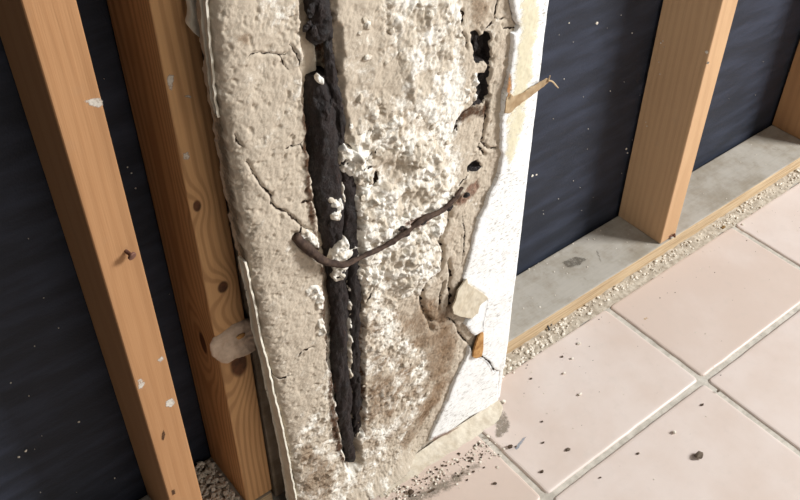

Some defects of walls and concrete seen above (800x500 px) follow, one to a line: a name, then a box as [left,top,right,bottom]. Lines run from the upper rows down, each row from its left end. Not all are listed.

crack [247,44,300,70]
crack [234,133,308,233]
spalling [185,0,559,500]
crack [419,211,496,372]